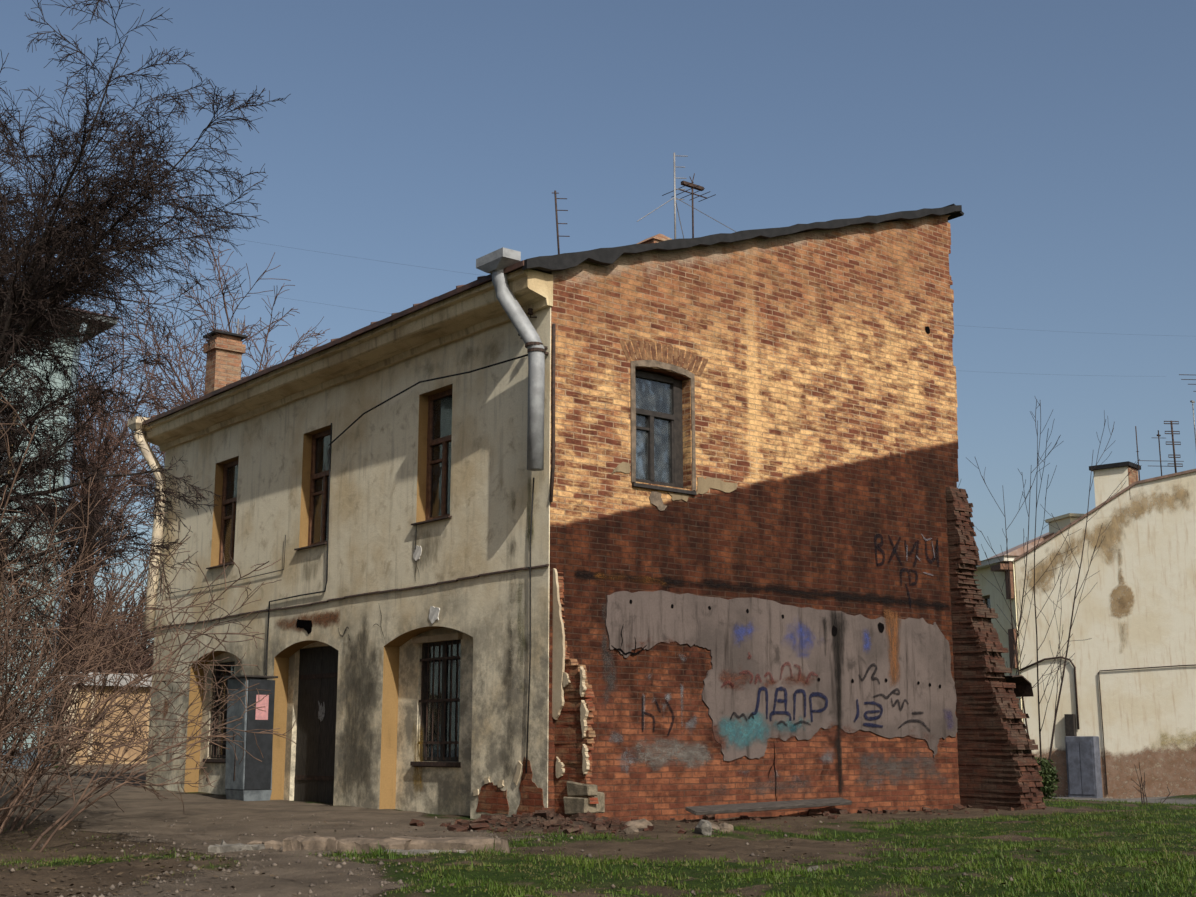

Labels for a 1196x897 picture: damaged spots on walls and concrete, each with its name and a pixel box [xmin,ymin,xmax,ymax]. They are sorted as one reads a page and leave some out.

water stain [1027,489,1188,590]
peeling [605,590,958,773]
spalling [473,757,545,815]